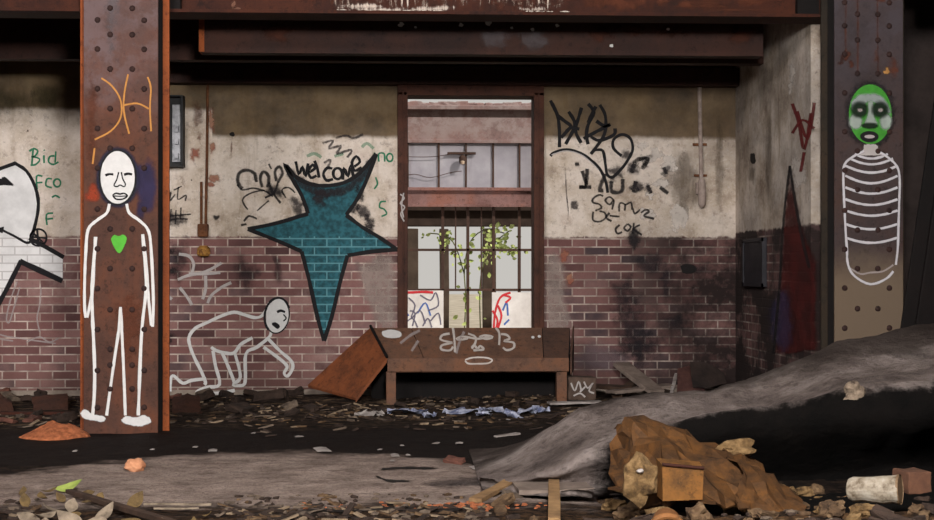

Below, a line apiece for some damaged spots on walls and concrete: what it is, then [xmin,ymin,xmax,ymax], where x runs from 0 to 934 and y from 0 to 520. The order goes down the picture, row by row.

rust [122,298,140,350]